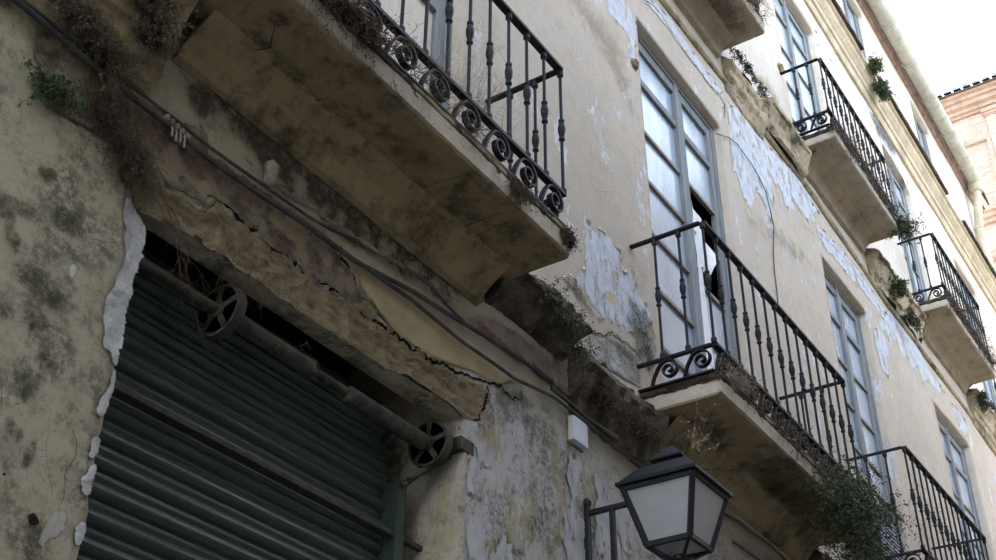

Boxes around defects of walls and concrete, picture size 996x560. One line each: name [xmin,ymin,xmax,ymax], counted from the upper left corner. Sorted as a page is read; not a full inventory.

peeling [607,0,639,70]
mould [7,418,36,466]
mould [0,194,67,331]
leakage [16,352,54,402]
flaking render [81,437,101,495]
flaking render [35,33,517,420]
crack [222,203,522,427]
flaking render [443,298,571,396]
peeling [563,215,652,387]
peeling [643,0,945,393]